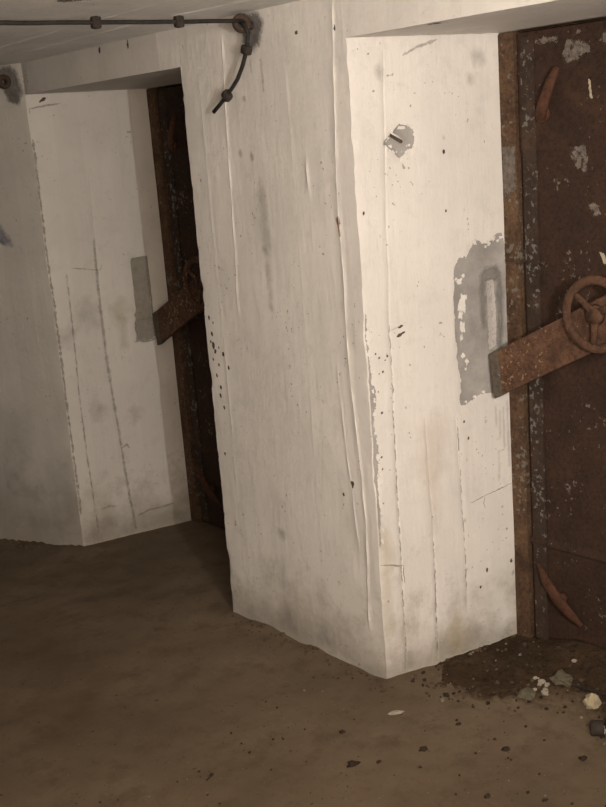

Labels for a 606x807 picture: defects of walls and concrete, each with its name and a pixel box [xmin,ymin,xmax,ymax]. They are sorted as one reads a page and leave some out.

spalling [383,123,416,162]
peeling [453,233,508,405]